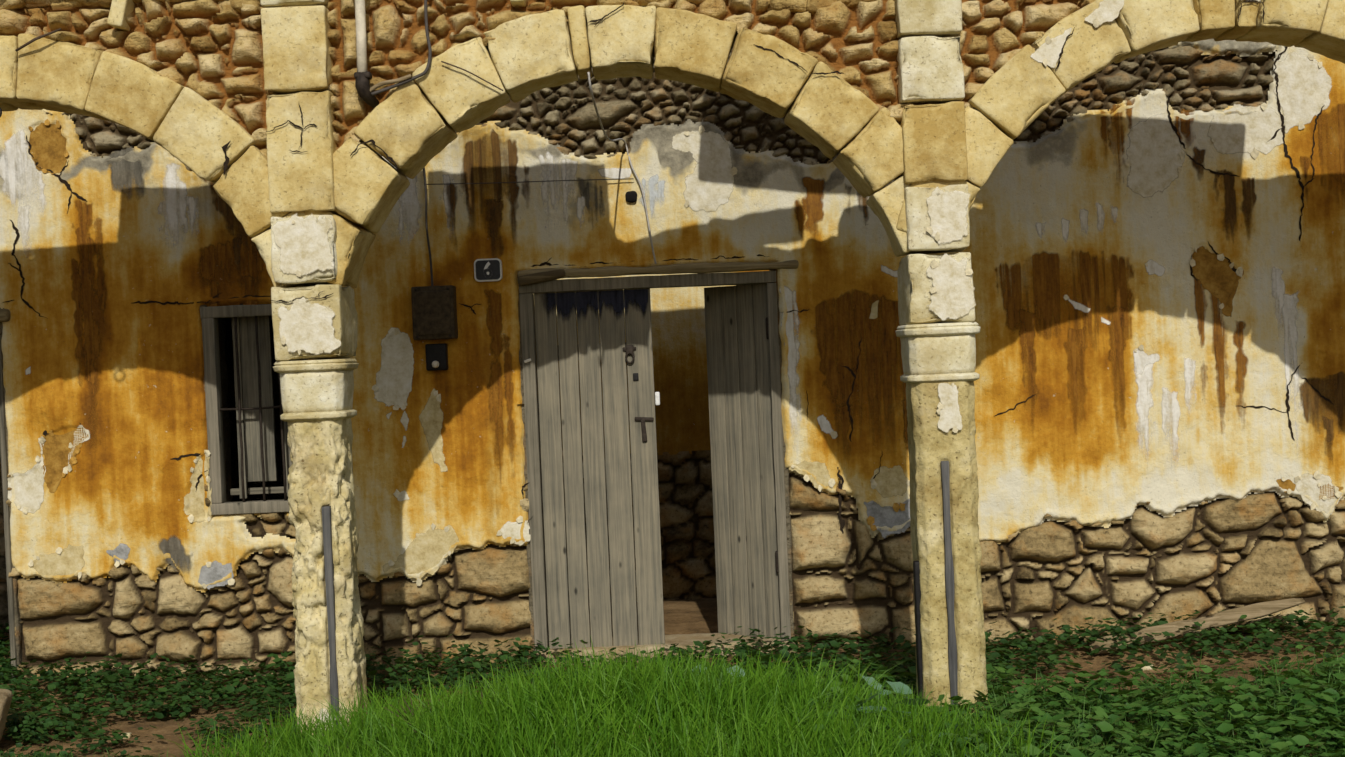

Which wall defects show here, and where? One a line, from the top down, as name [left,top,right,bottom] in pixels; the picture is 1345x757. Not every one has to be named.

crack [1238,0,1265,22]
peeling [672,125,738,212]
crack [1267,47,1324,241]
crack [0,220,48,319]
peeling [272,214,334,277]
peeling [278,297,341,355]
leakage [780,286,800,425]
peeling [372,327,448,472]
peeling [789,461,836,492]
peeling [1276,470,1343,514]
peeling [497,515,531,546]
peeling [198,561,235,589]